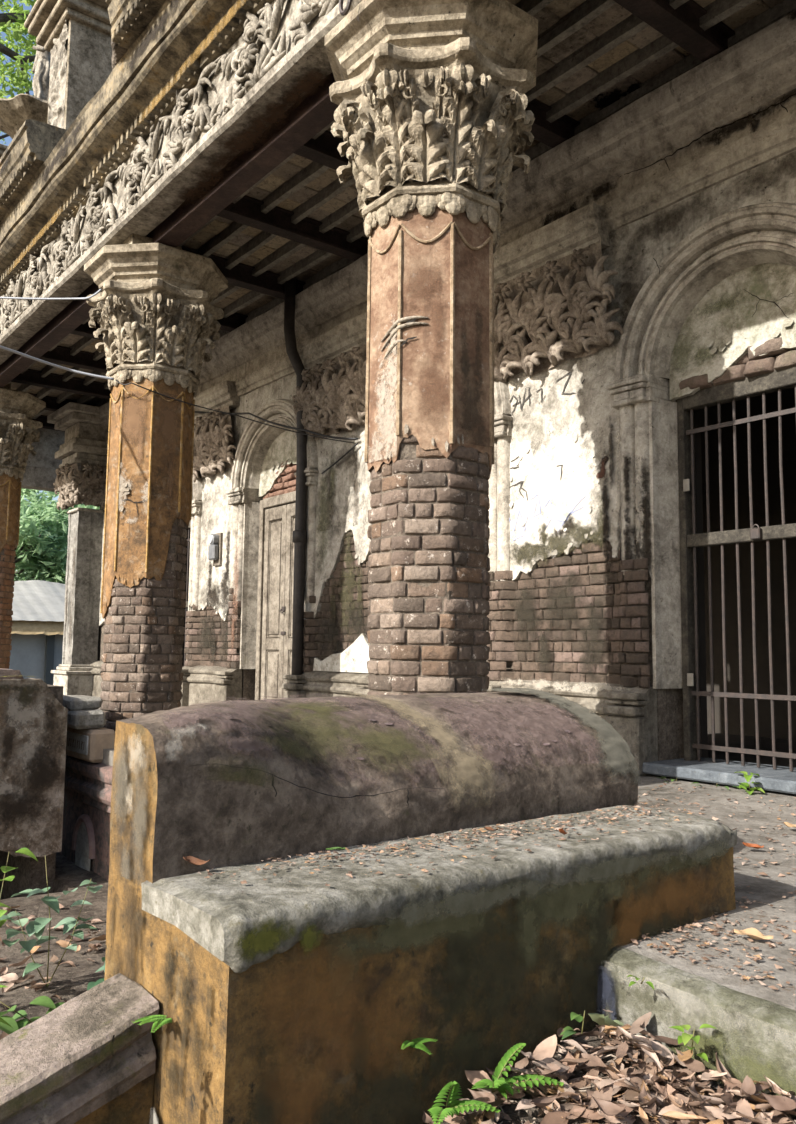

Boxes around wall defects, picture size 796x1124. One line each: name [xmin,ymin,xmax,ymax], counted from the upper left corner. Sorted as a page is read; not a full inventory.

crack [620,102,788,177]
spalling [679,319,796,390]
spalling [0,544,16,669]
spalling [100,320,650,795]
water stain [602,417,652,590]
water stain [0,685,60,825]
peeling [149,1108,158,1124]